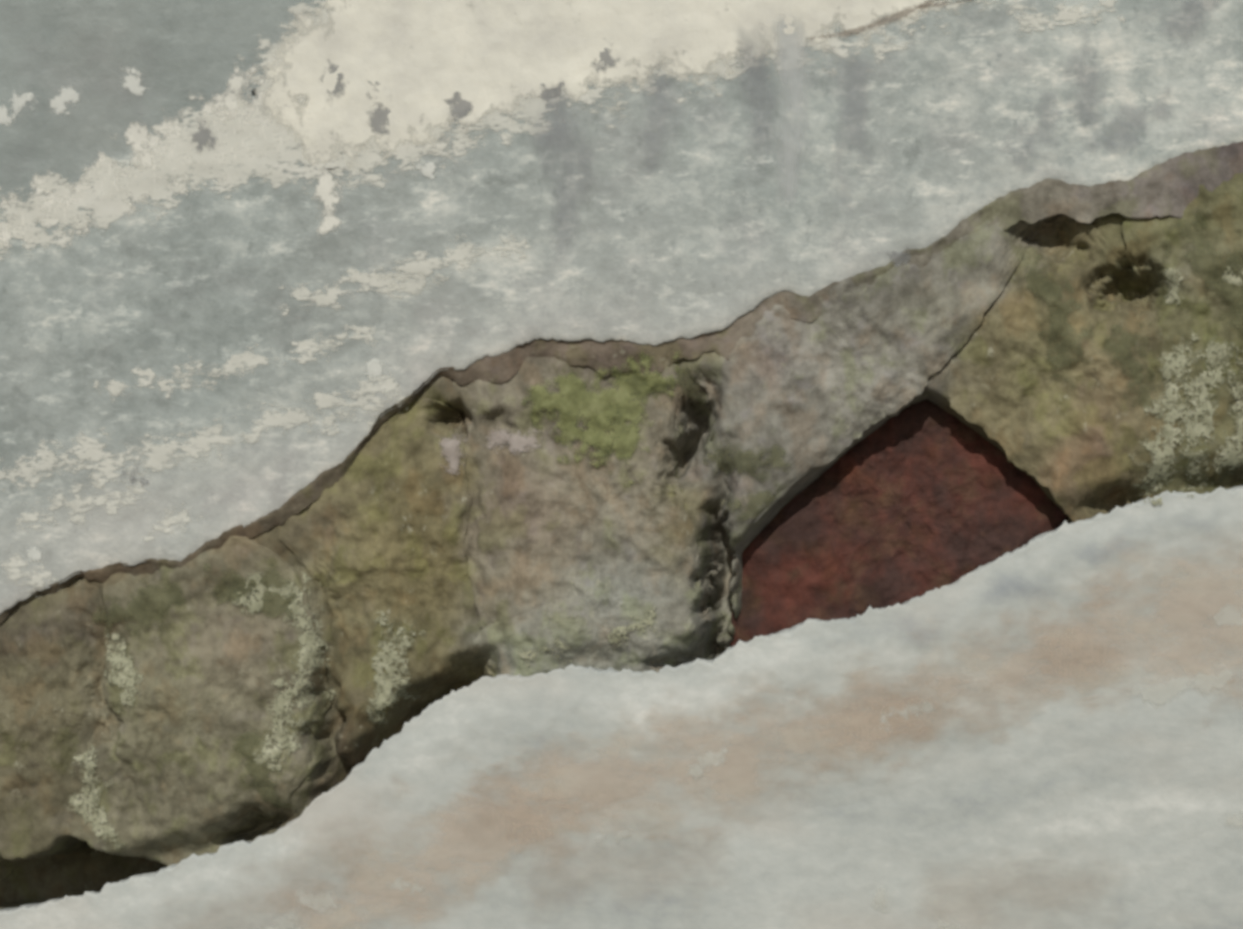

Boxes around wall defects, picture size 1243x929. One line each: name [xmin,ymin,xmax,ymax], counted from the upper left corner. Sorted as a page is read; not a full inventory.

peeling [0,0,994,260]
spalling [890,252,911,266]
peeling [242,402,315,443]
peeling [314,359,400,435]
peeling [0,423,233,531]
peeling [0,554,57,590]